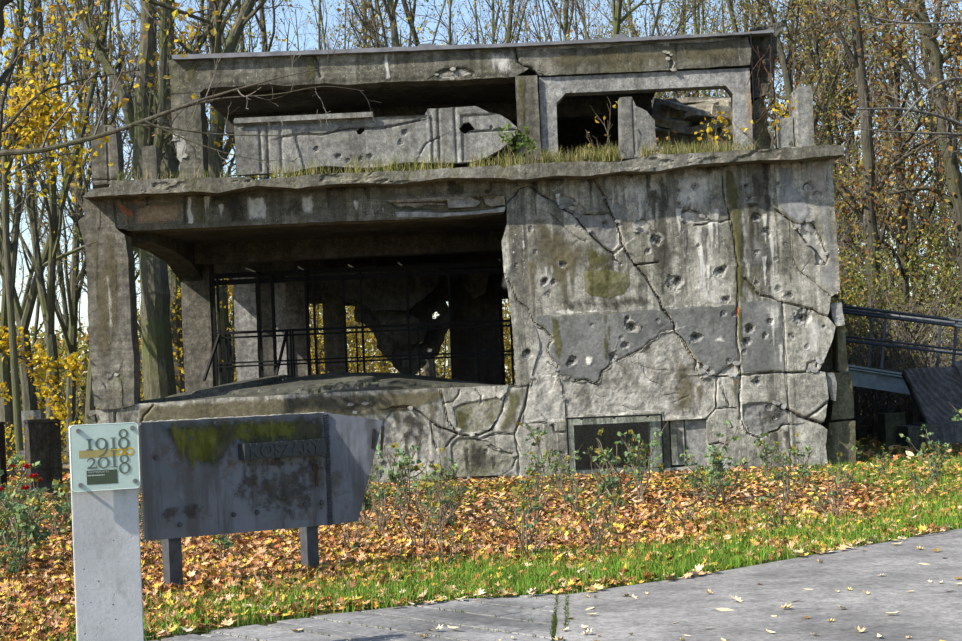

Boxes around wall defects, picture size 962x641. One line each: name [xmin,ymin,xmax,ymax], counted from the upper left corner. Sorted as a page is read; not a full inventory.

spalling [386,196,506,218]
water stain [606,165,728,304]
water stain [528,257,648,315]
crack [413,165,828,482]
spalling [523,329,741,425]
water stain [139,392,442,460]